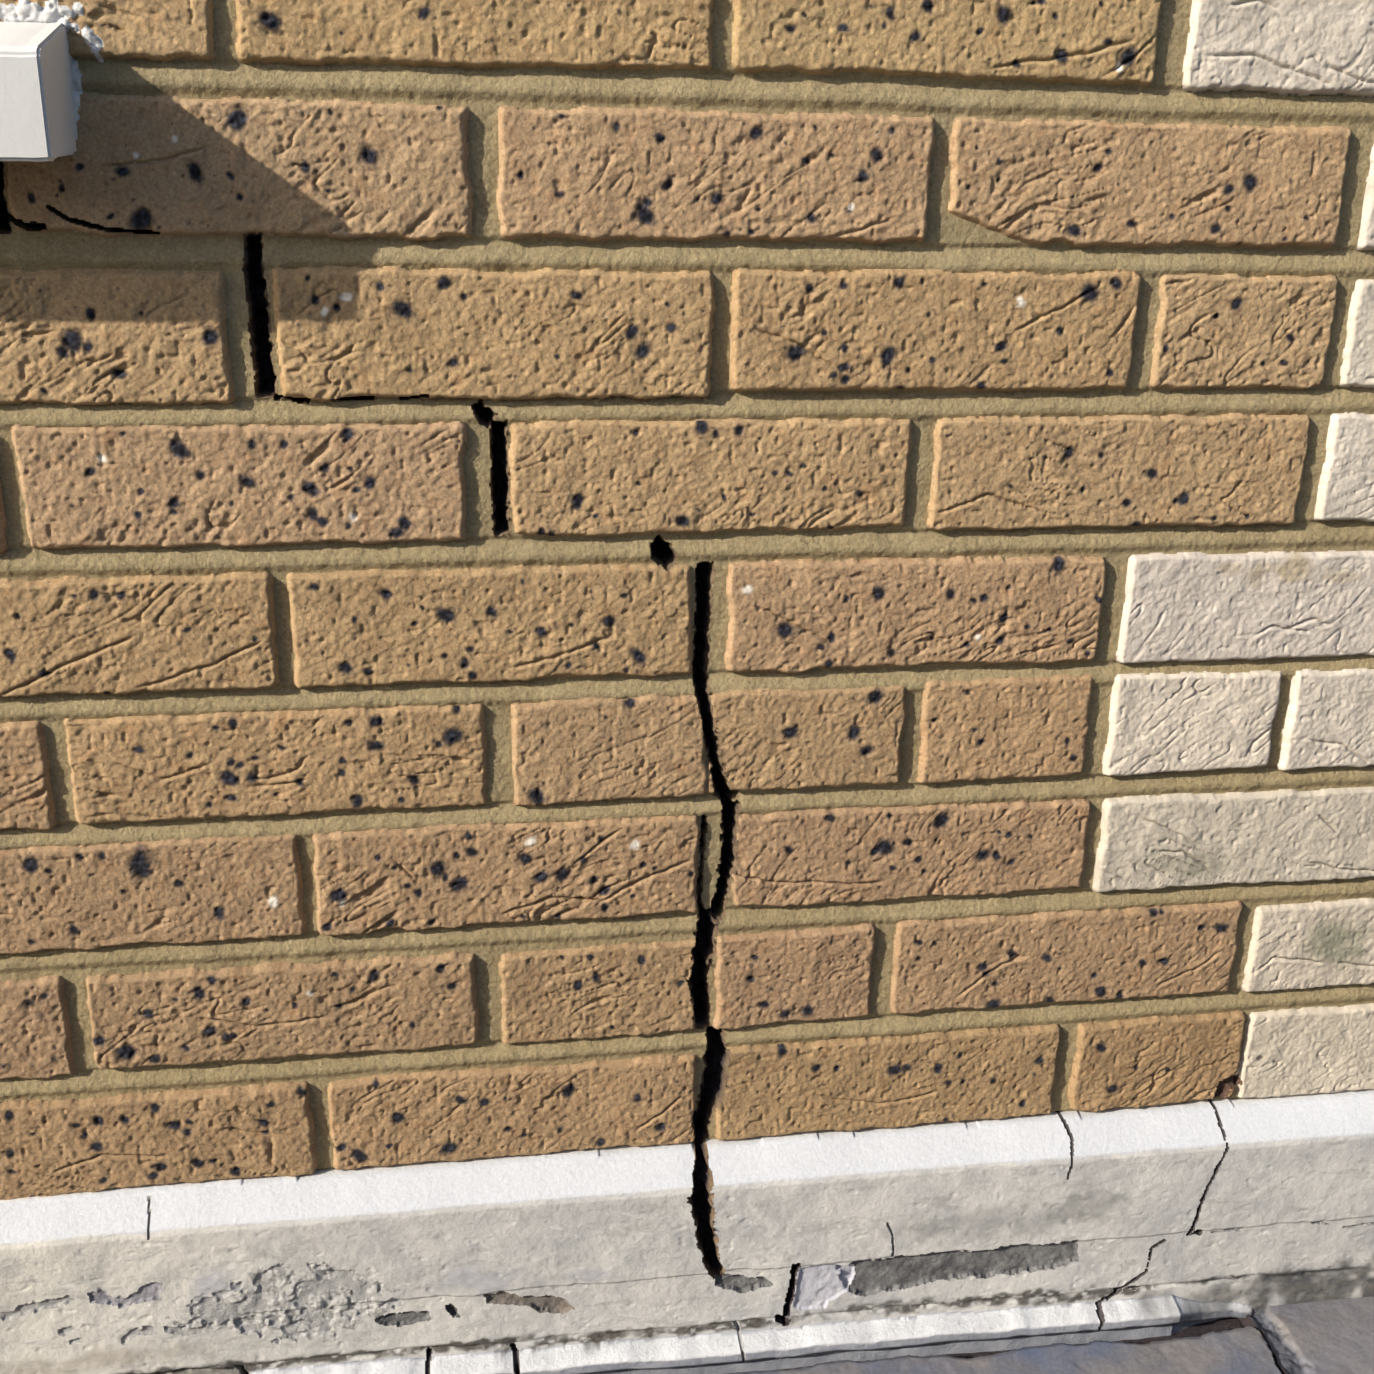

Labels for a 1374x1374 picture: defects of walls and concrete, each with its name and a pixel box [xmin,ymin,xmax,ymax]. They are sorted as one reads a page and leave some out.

crack [0,161,161,235]
crack [242,232,429,404]
crack [471,399,512,538]
crack [649,534,741,1279]
crack [145,1195,153,1240]
crack [774,1099,1286,1374]
crack [1311,1221,1374,1229]
spalling [57,1325,82,1345]
spalling [0,1282,163,1321]
peeling [121,1261,460,1345]
spalling [793,1240,1079,1311]